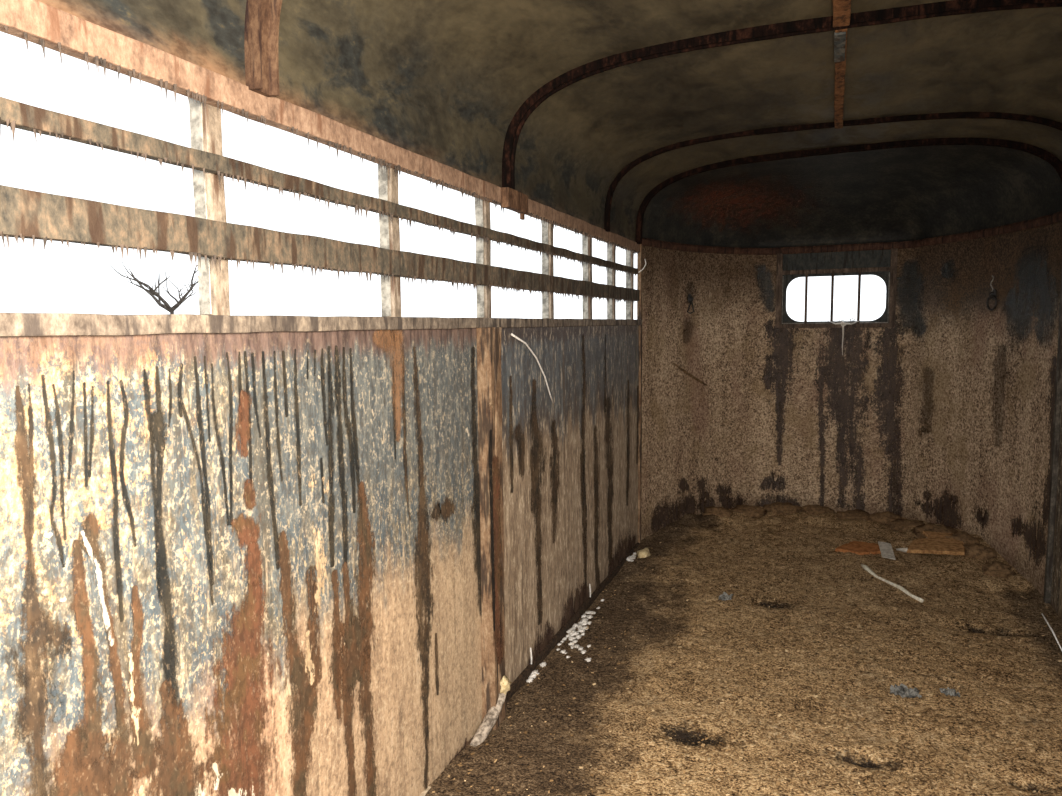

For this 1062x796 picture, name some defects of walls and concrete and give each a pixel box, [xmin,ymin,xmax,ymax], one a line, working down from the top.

corrosion [235,390,252,457]
corrosion [373,330,403,441]
damp [651,313,962,534]
damp [1010,355,1062,566]
peeling [80,530,114,646]
peeling [128,653,141,746]
corrosion [41,479,378,796]
peeling [304,630,315,685]
peeling [312,525,327,613]
corrosion [491,455,504,665]
damp [974,508,989,531]
peeling [195,762,255,796]